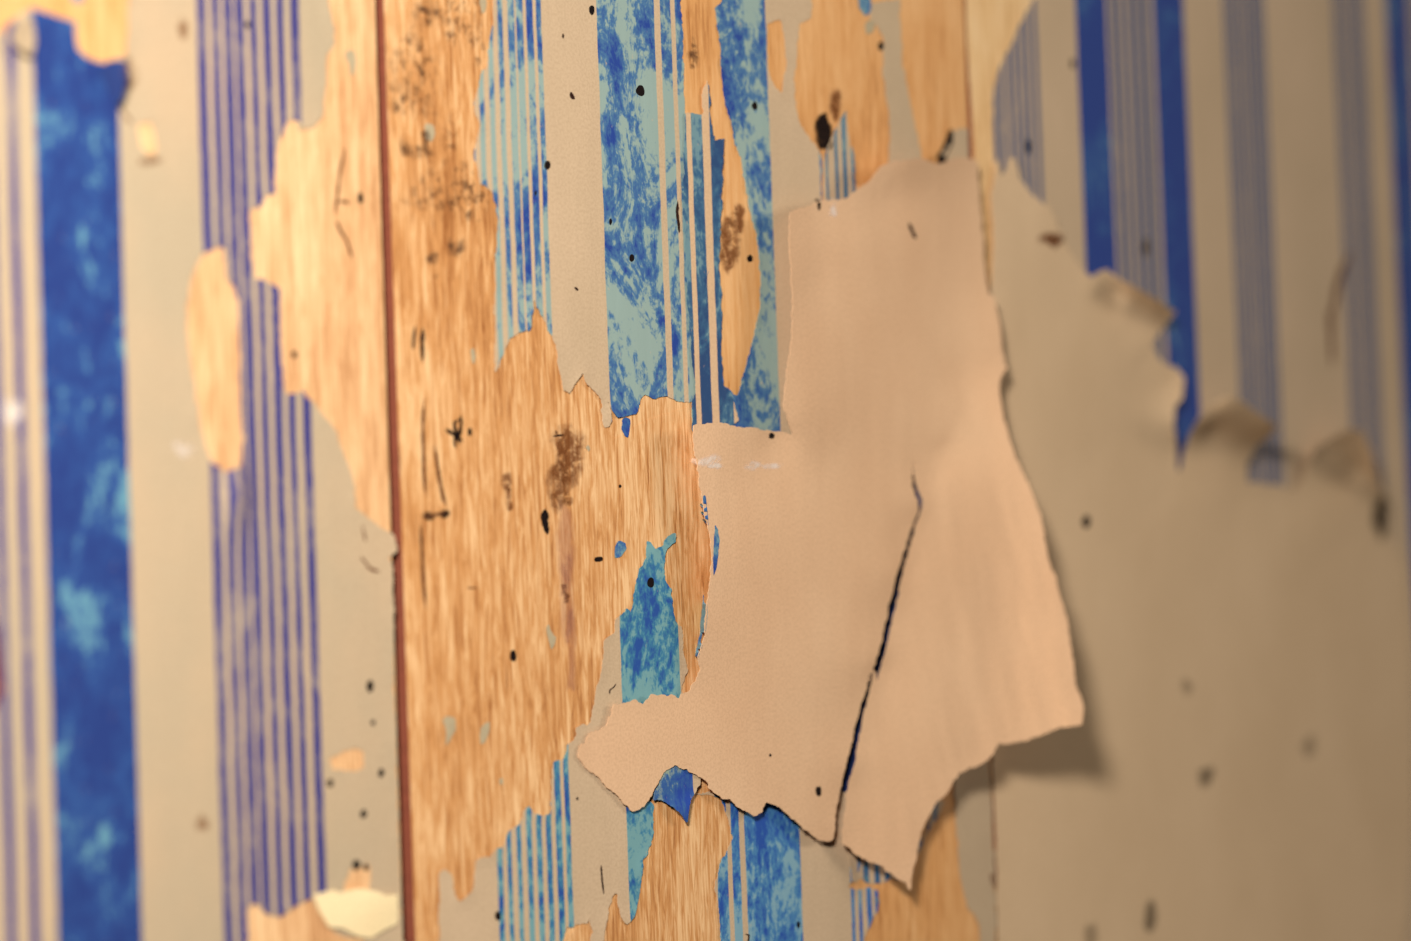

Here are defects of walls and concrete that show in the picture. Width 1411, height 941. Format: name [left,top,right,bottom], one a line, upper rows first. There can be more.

peeling [0,0,128,105]
peeling [186,246,244,472]
peeling [247,0,1084,941]